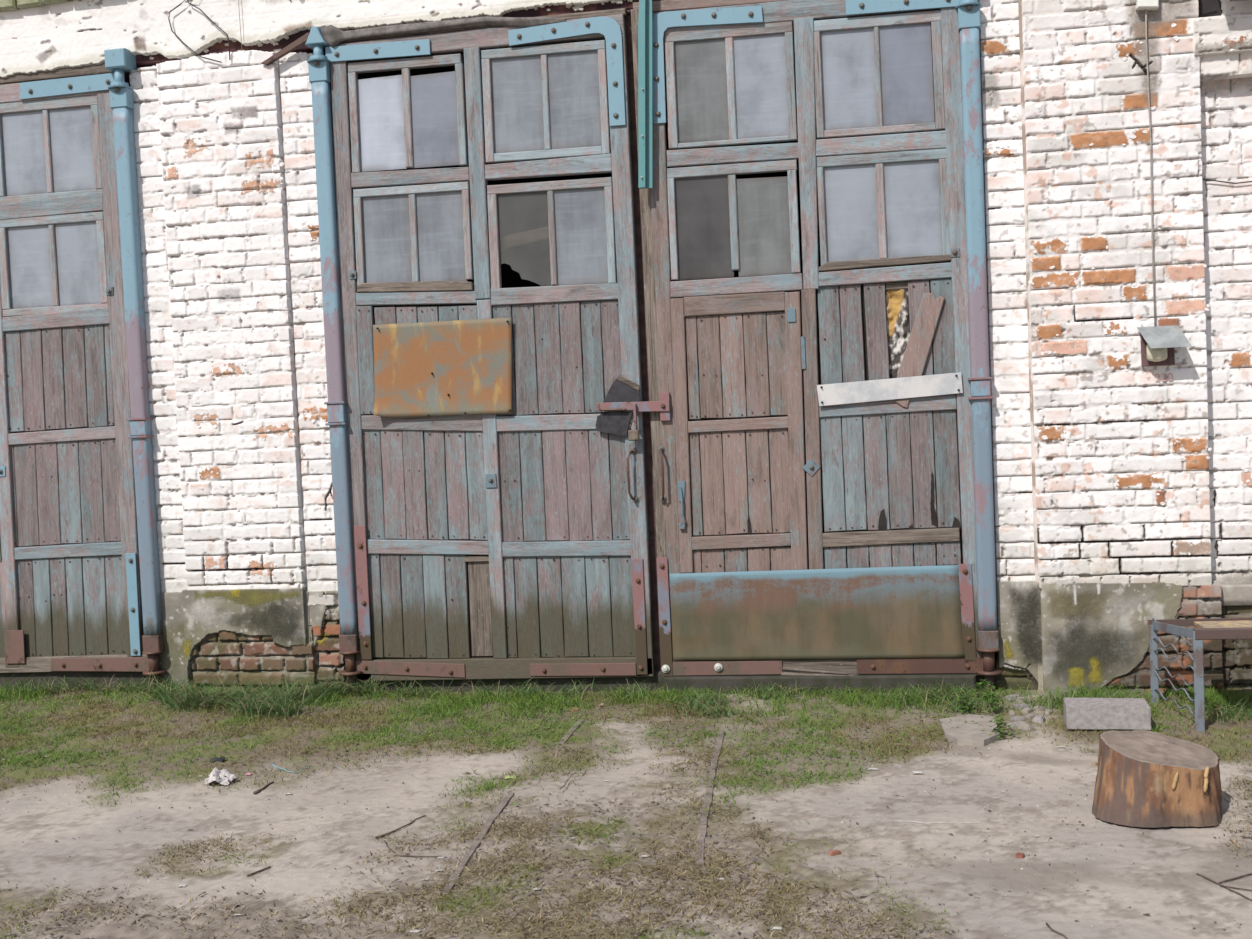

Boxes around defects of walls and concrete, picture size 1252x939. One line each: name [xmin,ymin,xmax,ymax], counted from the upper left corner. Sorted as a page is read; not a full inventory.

peeling [1115,18,1188,61]
peeling [1121,92,1158,110]
peeling [1068,127,1154,150]
peeling [164,137,210,188]
peeling [240,149,284,195]
peeling [1028,234,1147,301]
peeling [1036,323,1087,356]
peeling [1104,354,1129,371]
peeling [252,406,328,440]
spalling [184,594,346,692]
leakage [236,605,301,640]
spalling [1101,580,1224,694]